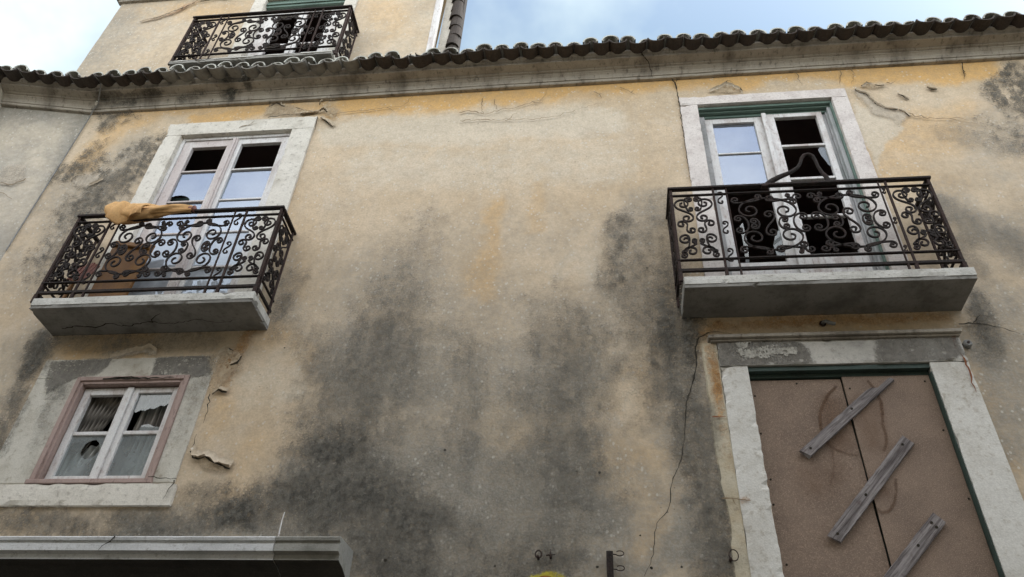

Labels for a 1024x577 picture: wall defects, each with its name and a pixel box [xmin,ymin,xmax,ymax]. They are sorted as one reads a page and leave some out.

flaking render [265,99,338,129]
crack [459,52,690,174]
flaking render [854,81,910,121]
mould [974,61,1024,139]
leakage [24,82,172,282]
flaking render [203,346,243,423]
peeling [735,342,797,358]
crack [955,315,1024,390]
flaking render [190,434,234,471]
leakage [0,304,475,577]
crack [644,331,731,576]